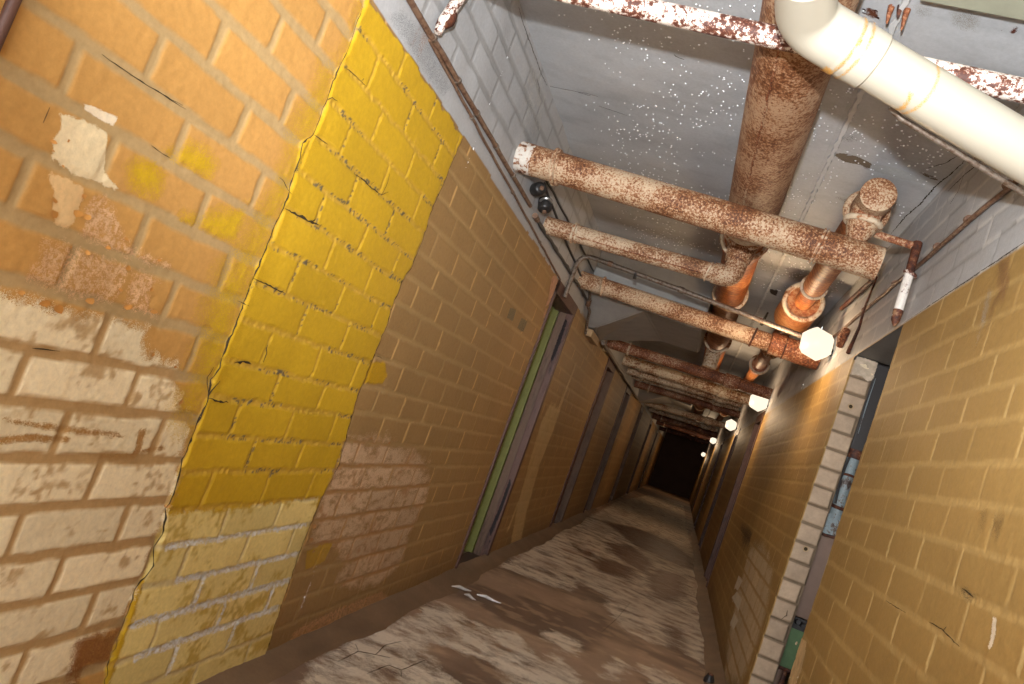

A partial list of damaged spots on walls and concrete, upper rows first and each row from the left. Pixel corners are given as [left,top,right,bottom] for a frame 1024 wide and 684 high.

peeling [0,104,192,684]
crack [102,6,366,684]
rust [821,8,879,79]
rust [894,64,940,115]